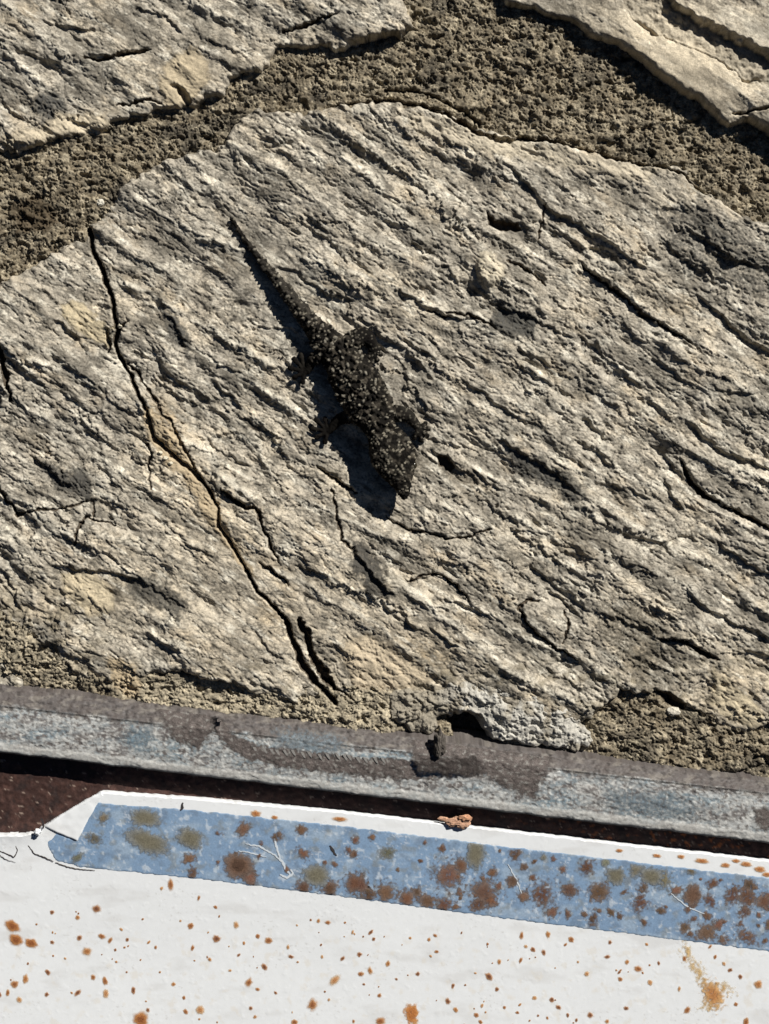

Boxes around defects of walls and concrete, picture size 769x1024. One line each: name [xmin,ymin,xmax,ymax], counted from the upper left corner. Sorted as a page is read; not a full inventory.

crack [88,227,358,705]
corrosion [85,812,109,844]
corrosion [124,809,203,878]
corrosion [216,811,282,885]
corrosion [437,814,472,829]
corrosion [6,920,37,947]
corrosion [77,928,129,973]
corrosion [285,834,769,1013]
corrosion [0,962,29,1002]
corrosion [134,1001,149,1024]
corrosion [403,1004,419,1024]
corrosion [503,996,593,1024]